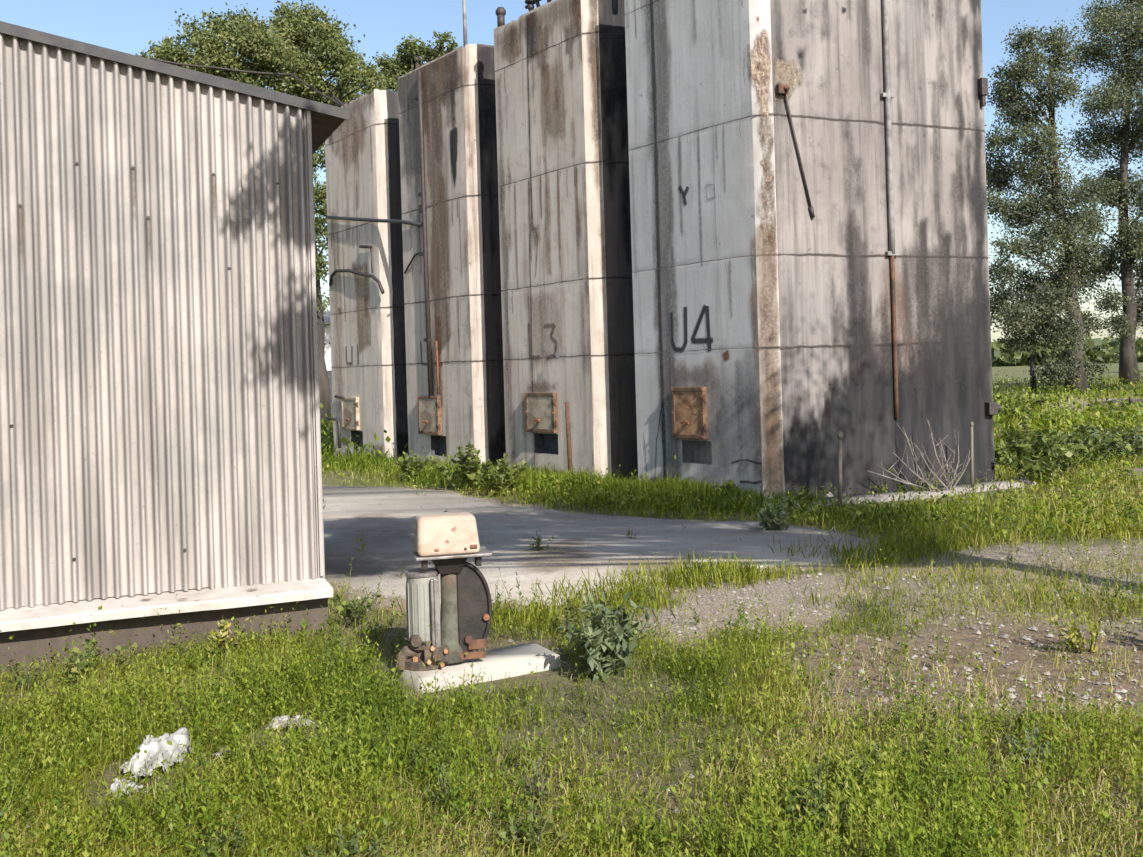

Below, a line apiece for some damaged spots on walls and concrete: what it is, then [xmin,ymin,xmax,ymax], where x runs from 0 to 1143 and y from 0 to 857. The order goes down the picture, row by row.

water stain [398,0,702,481]
rust [751,225,784,497]
water stain [783,100,995,502]
water stain [957,0,982,101]